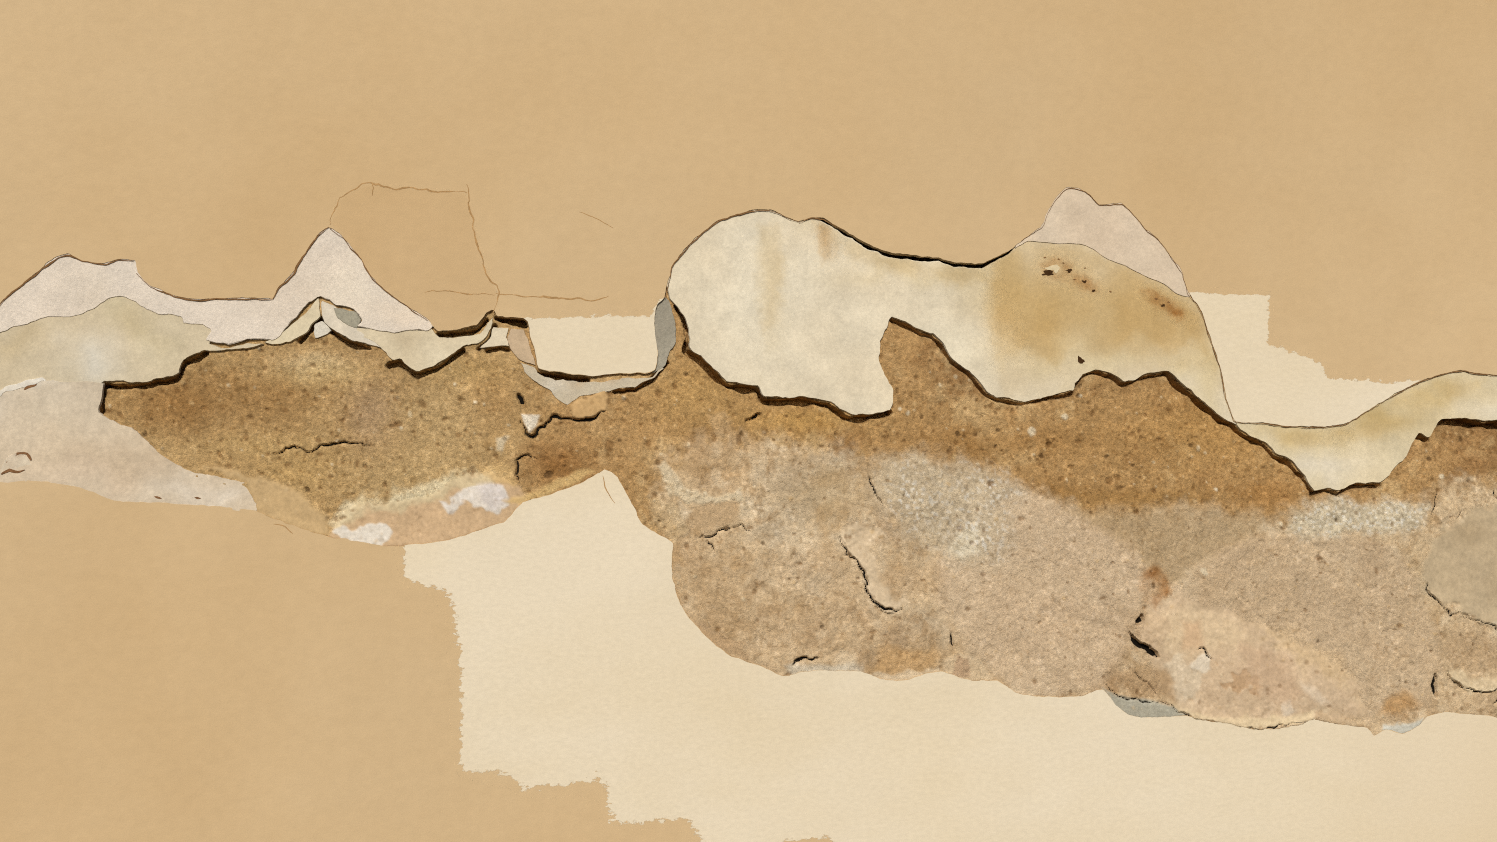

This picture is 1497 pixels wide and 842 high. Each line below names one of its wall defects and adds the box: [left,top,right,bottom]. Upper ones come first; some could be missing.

crack [330,182,608,312]
crack [279,441,363,454]
spalling [0,187,1497,735]
crack [840,539,902,612]
crack [1105,616,1189,716]